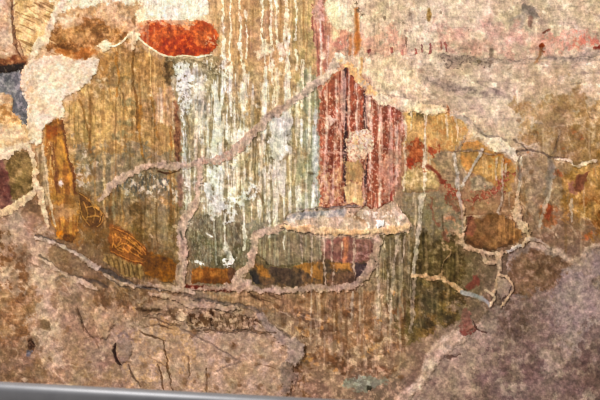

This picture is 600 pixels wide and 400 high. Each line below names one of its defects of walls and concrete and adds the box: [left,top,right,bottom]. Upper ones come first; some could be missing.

flaking render [0,54,100,160]
damp [161,60,200,171]
crack [0,58,383,392]
efflorescence [204,92,224,158]
efflorescence [204,164,258,268]
damp [221,0,305,199]
spalling [396,212,600,400]
crack [410,115,598,308]